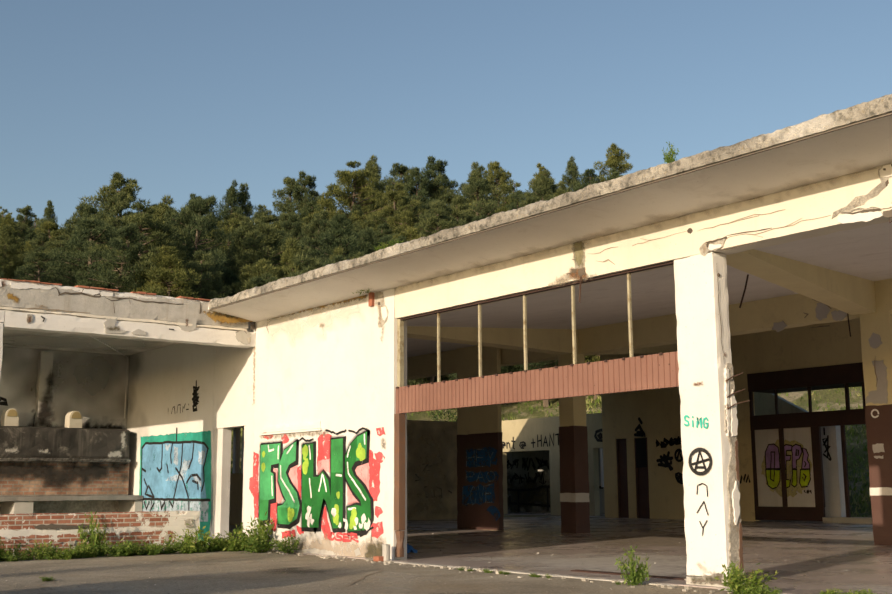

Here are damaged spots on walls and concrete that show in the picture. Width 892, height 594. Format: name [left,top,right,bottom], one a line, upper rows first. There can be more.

spalling [832,163,892,224]
crack [19,287,202,314]
spalling [565,241,586,303]
spalling [699,236,728,256]
crack [717,275,725,364]
crack [595,209,881,265]
spalling [866,360,888,404]
spalling [689,363,749,584]